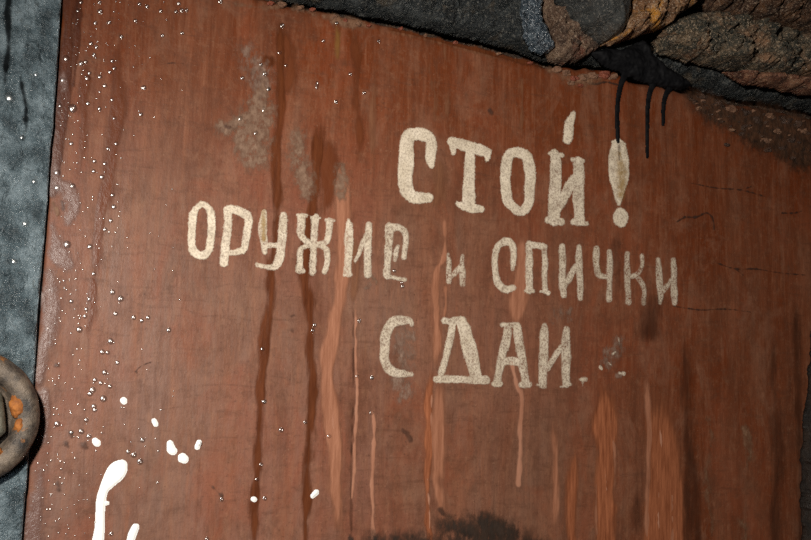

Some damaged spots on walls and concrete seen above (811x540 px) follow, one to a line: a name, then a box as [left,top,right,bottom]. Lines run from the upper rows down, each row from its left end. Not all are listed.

damp [290,131,314,200]
damp [320,163,377,525]
damp [431,219,447,363]
damp [424,378,445,540]